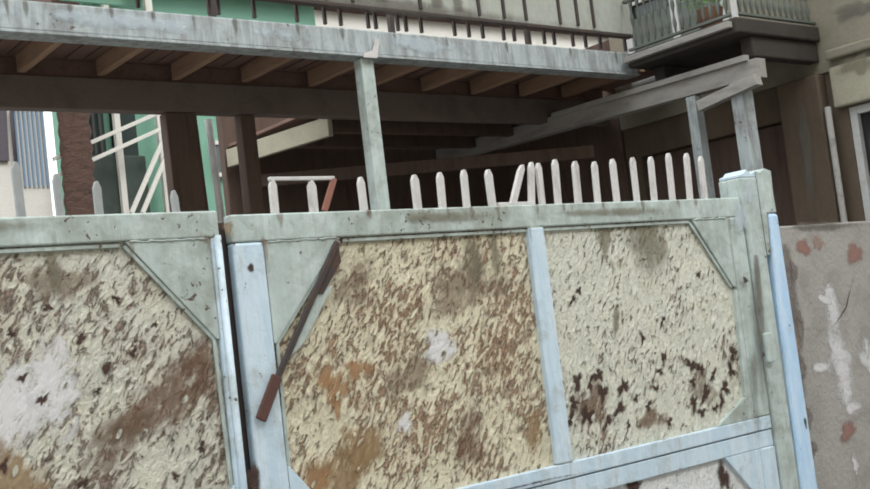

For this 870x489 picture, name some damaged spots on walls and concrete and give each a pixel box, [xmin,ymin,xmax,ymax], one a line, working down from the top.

flaking render [783,237,870,442]